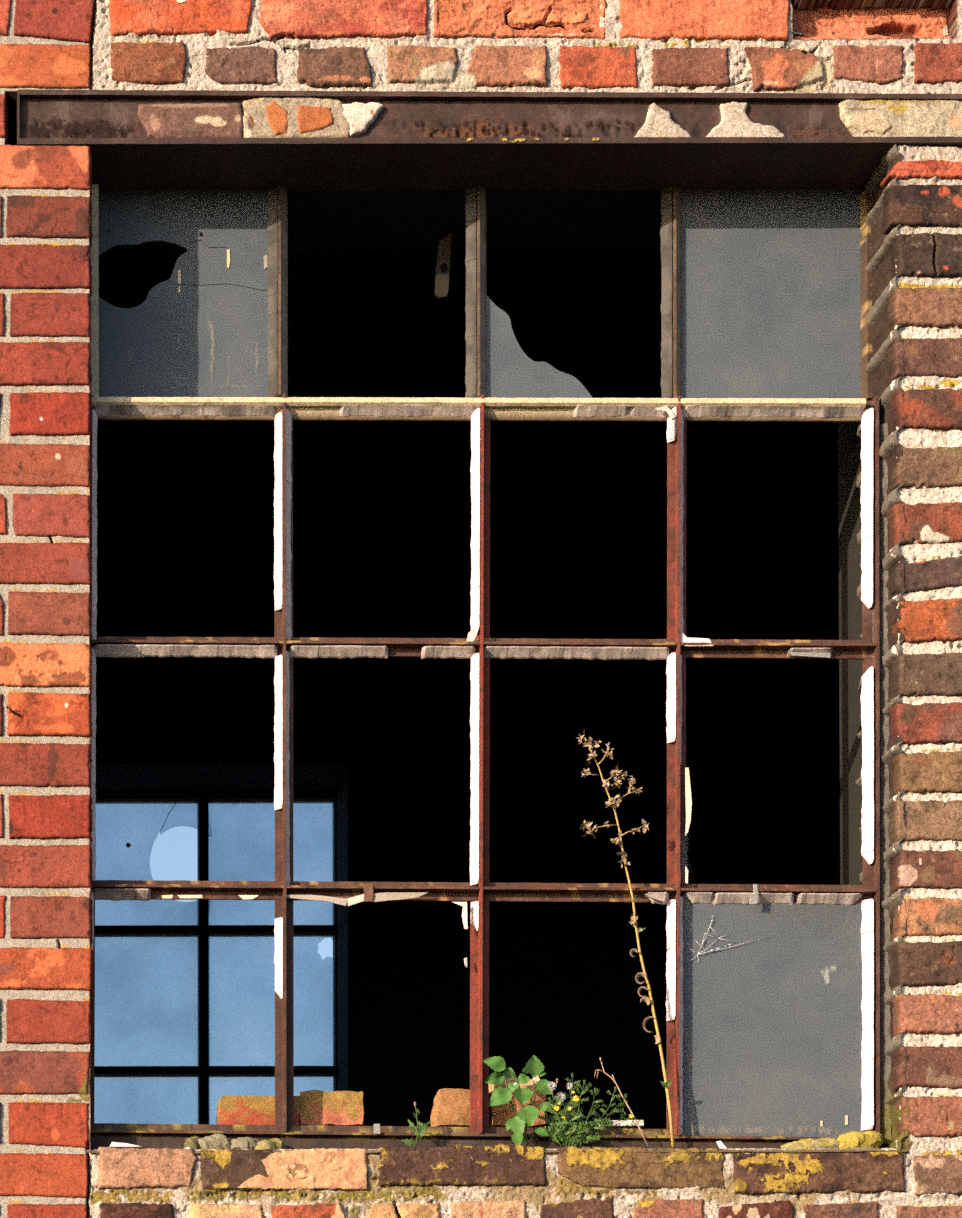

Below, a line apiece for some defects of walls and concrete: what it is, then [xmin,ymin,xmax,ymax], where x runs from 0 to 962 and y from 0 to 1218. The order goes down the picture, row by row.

rust [23,118,136,138]
spalling [249,101,334,136]
rust [414,118,633,138]
damp [550,1146,660,1218]
damp [660,1148,822,1194]
spalling [726,1204,770,1218]